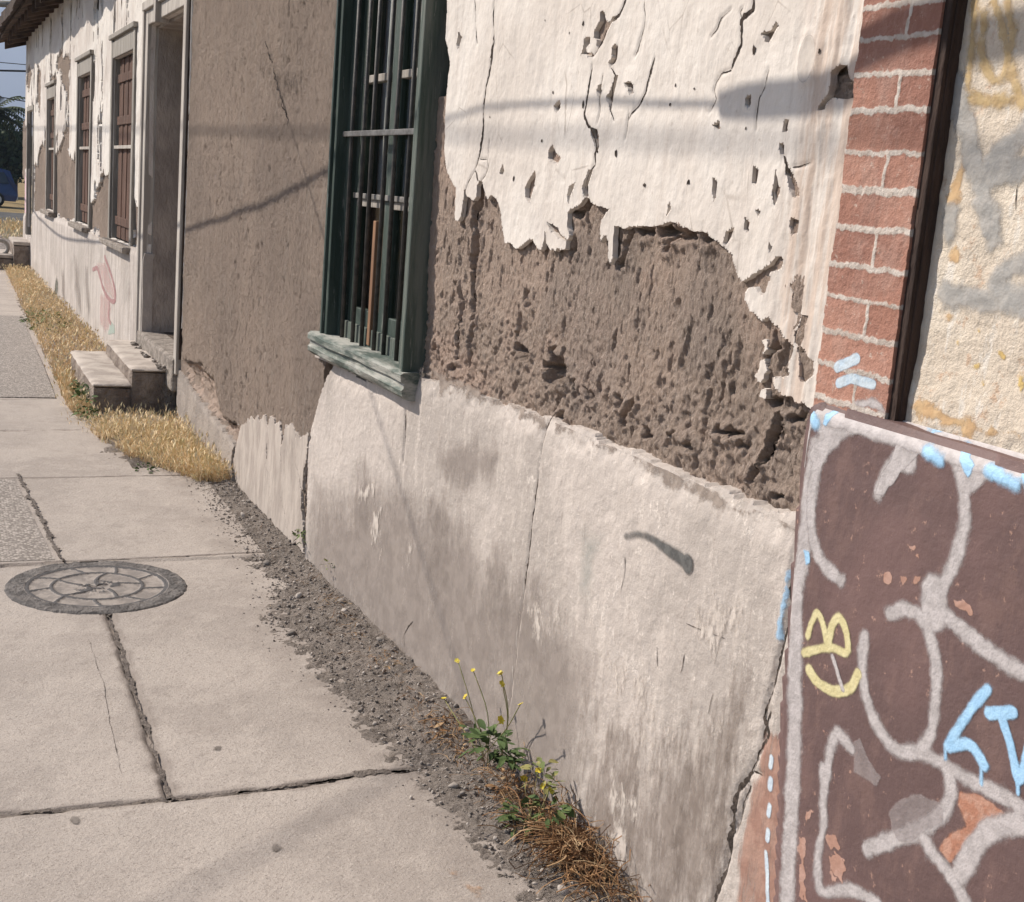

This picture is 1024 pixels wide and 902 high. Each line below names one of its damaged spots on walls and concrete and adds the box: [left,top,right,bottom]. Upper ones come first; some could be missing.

spalling [22,120,75,220]
spalling [27,52,71,113]
crack [461,6,494,224]
crack [583,0,655,197]
flaking render [834,66,854,99]
spalling [418,96,814,512]
flaking render [186,362,311,554]
crack [301,444,309,546]
crack [523,413,556,604]
crack [714,627,788,902]